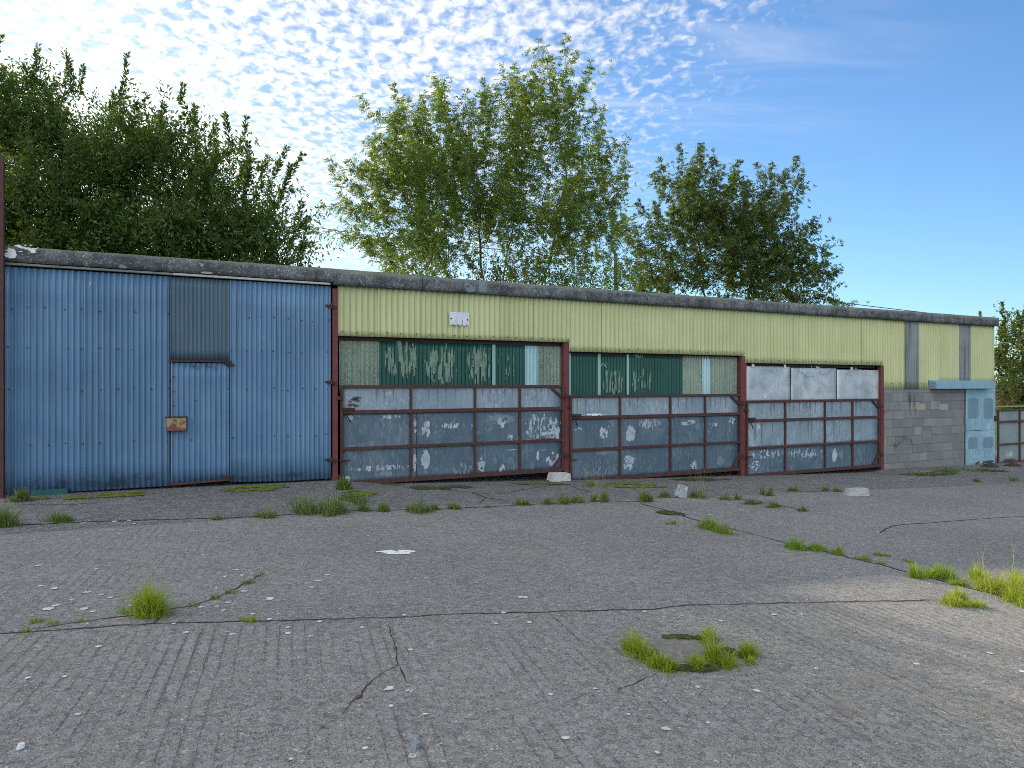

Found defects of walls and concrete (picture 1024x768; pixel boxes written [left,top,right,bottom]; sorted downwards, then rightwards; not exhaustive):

peeling [385,341,490,384]
peeling [601,363,651,395]
peeling [413,421,473,437]
peeling [486,413,560,466]
peeling [626,419,661,442]
peeling [345,450,430,480]
peeling [452,457,485,474]
crack [0,575,935,725]